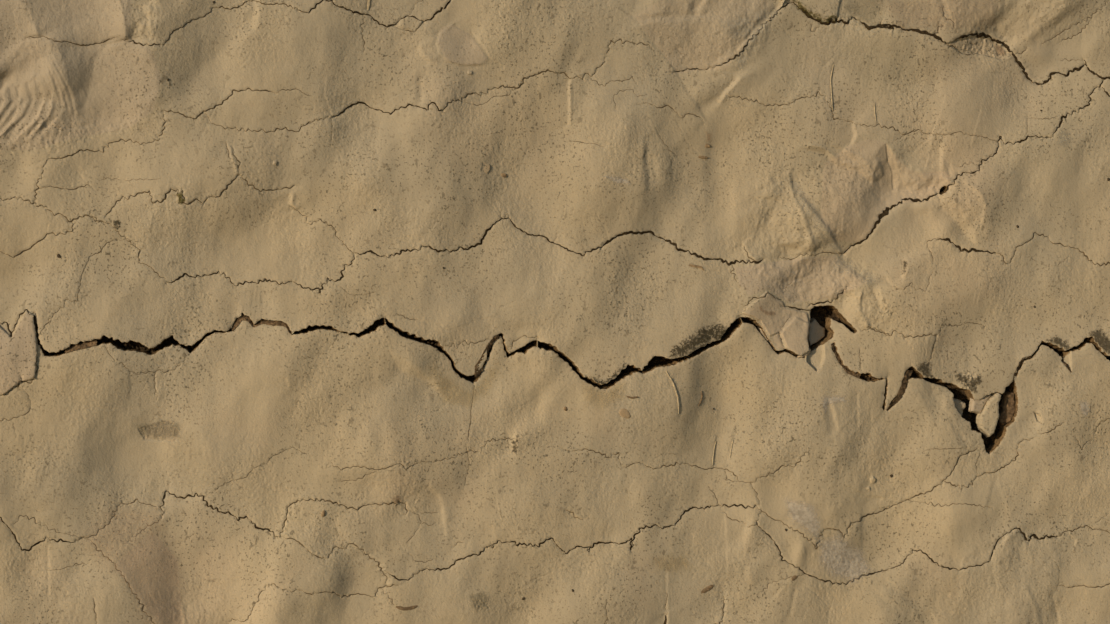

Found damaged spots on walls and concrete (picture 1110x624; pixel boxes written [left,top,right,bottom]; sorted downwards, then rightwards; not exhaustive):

crack [0,0,1110,481]
peeling [0,313,37,394]
spalling [735,256,868,357]
spalling [943,380,1019,455]
crack [0,418,1110,624]